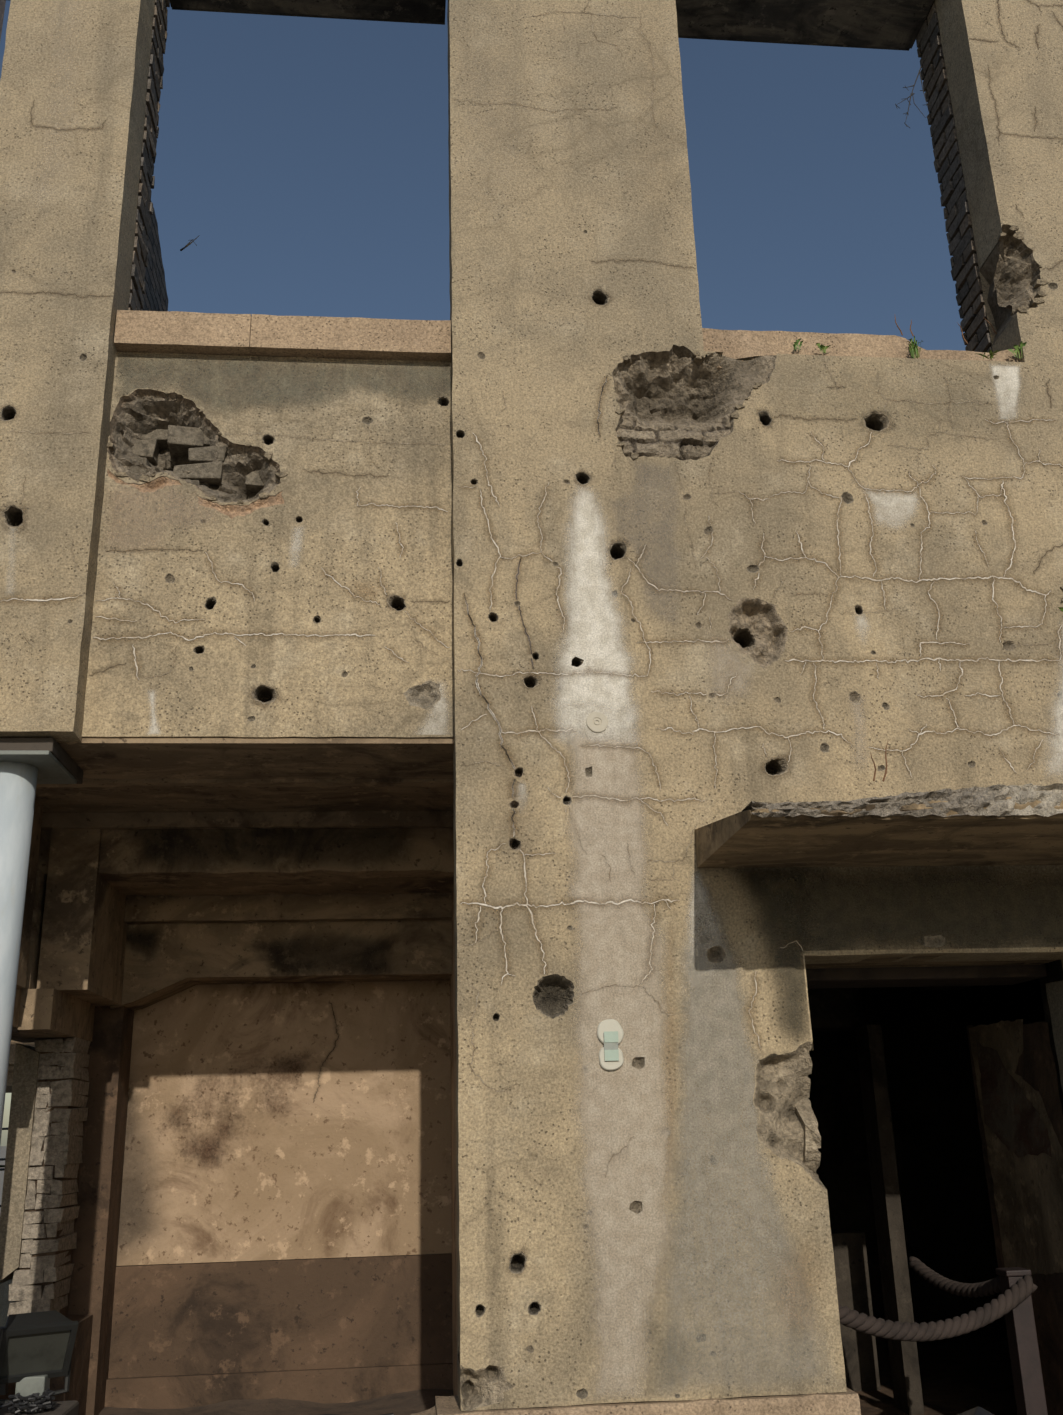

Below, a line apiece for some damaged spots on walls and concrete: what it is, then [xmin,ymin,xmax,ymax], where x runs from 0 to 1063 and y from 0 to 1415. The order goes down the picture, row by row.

crack [969,0,1063,140]
flaking render [997,225,1058,314]
spalling [107,389,288,524]
flaking render [730,382,762,420]
crack [0,360,1063,1103]
spalling [849,691,861,703]
leakage [1053,691,1063,767]
spalling [742,783,1063,817]
leakage [558,491,810,1391]
spalling [753,1042,827,1190]